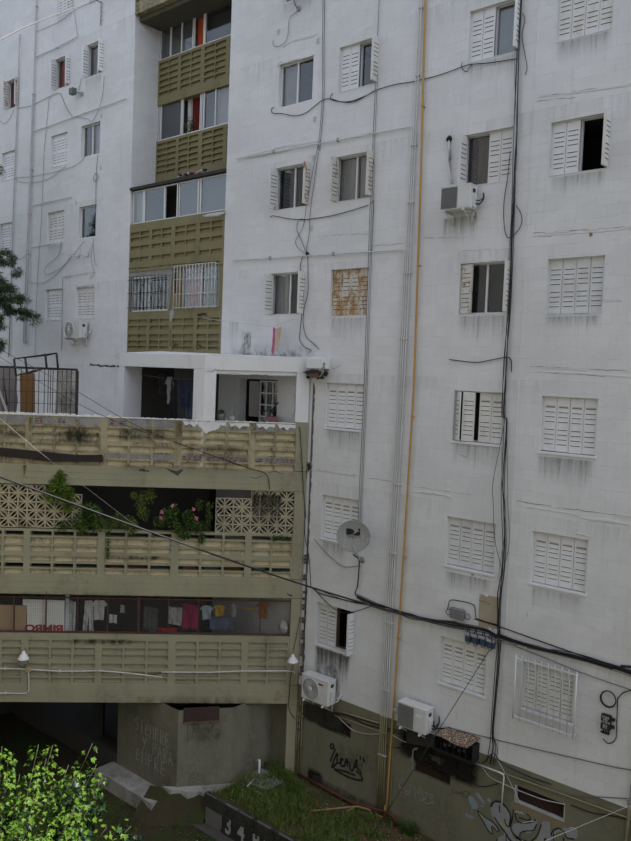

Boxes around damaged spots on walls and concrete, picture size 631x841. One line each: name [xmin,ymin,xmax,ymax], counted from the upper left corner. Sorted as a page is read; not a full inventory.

leakage [65,429,98,443]
crack [517,500,631,519]
leakage [317,647,348,685]